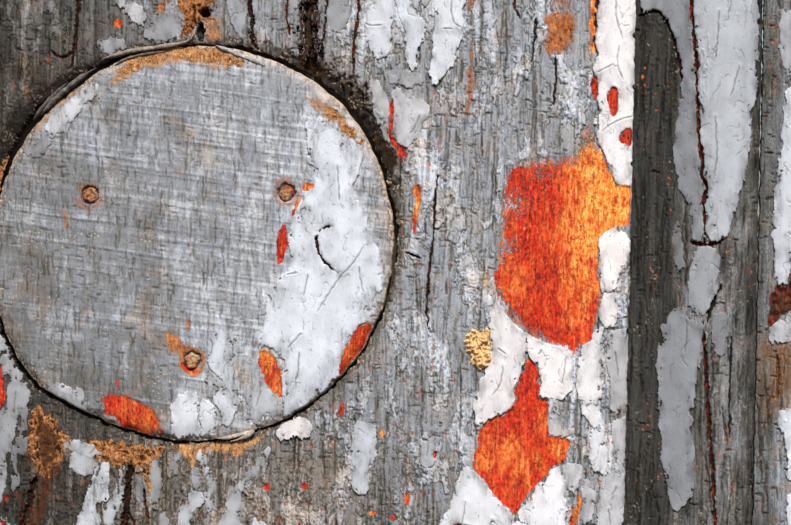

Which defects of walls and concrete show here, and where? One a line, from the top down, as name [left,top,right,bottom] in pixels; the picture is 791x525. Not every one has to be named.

peeling [226,0,248,44]
peeling [284,0,298,25]
peeling [323,0,353,32]
peeling [362,0,466,162]
peeling [768,9,791,345]
peeling [44,119,383,441]
peeling [439,0,760,525]
rust [166,332,208,377]
peeling [0,335,31,503]
peeling [63,439,271,525]
peeling [348,417,384,495]
peeling [420,432,438,467]